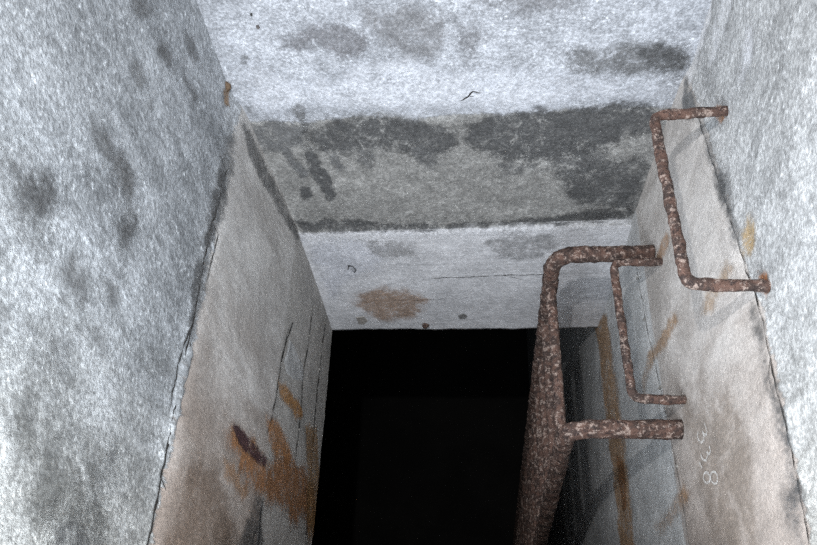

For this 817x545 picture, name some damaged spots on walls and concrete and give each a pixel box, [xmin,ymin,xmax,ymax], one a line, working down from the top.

water stain [92,119,137,246]
water stain [205,134,234,246]
water stain [242,0,731,294]
water stain [718,173,738,239]
water stain [189,258,207,333]
corrosion [280,385,303,418]
corrosion [361,290,425,320]
corrosion [595,315,622,420]
corrosion [642,316,677,391]
water stain [30,450,106,545]
corrosion [230,420,319,539]
corrosion [609,439,635,545]